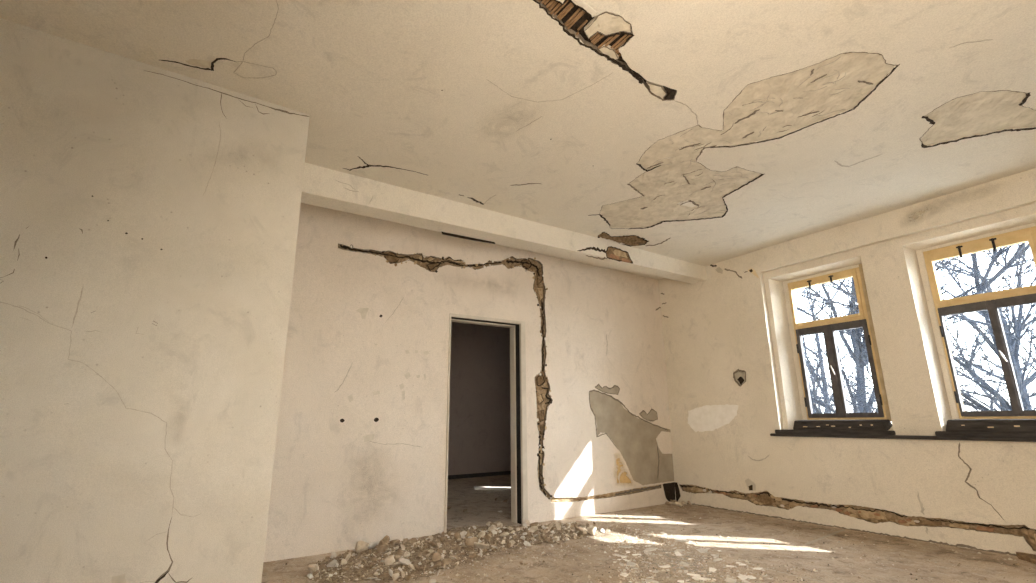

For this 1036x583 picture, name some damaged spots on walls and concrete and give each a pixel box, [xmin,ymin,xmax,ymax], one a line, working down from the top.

crack [144,0,310,195]
peeling [533,0,900,264]
peeling [919,90,1036,148]
crack [0,287,197,583]
peeling [589,384,674,485]
crack [549,443,1036,556]